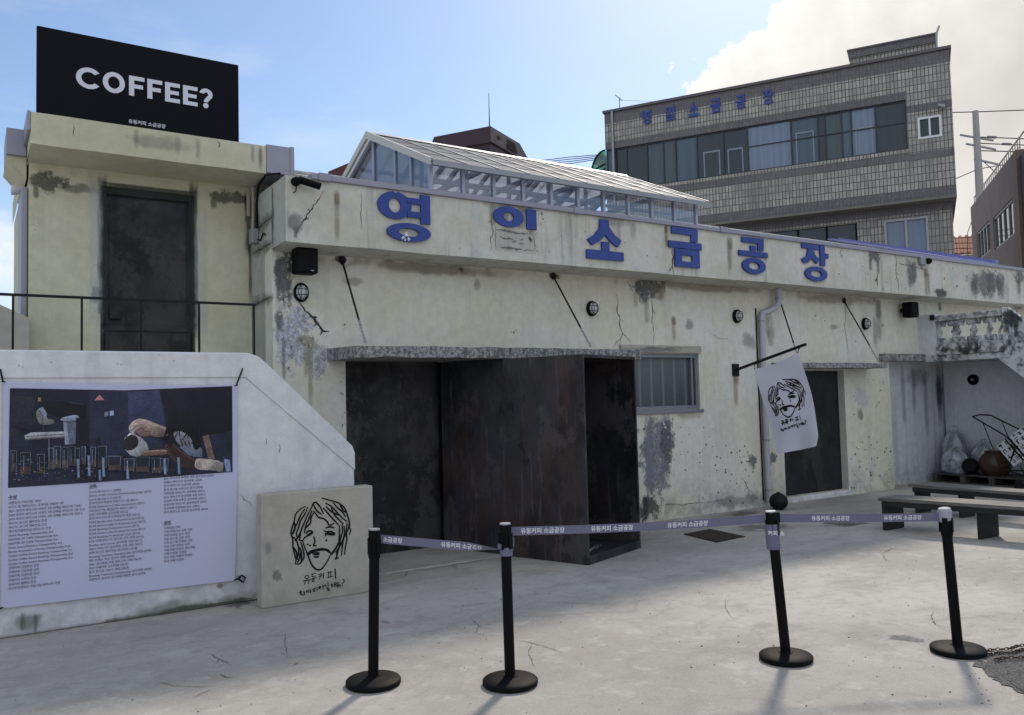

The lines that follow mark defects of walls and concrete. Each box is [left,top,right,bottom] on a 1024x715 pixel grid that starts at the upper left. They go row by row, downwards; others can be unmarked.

crack [294,191,324,236]
crack [299,302,329,335]
crack [615,294,727,353]
damp [640,496,659,523]